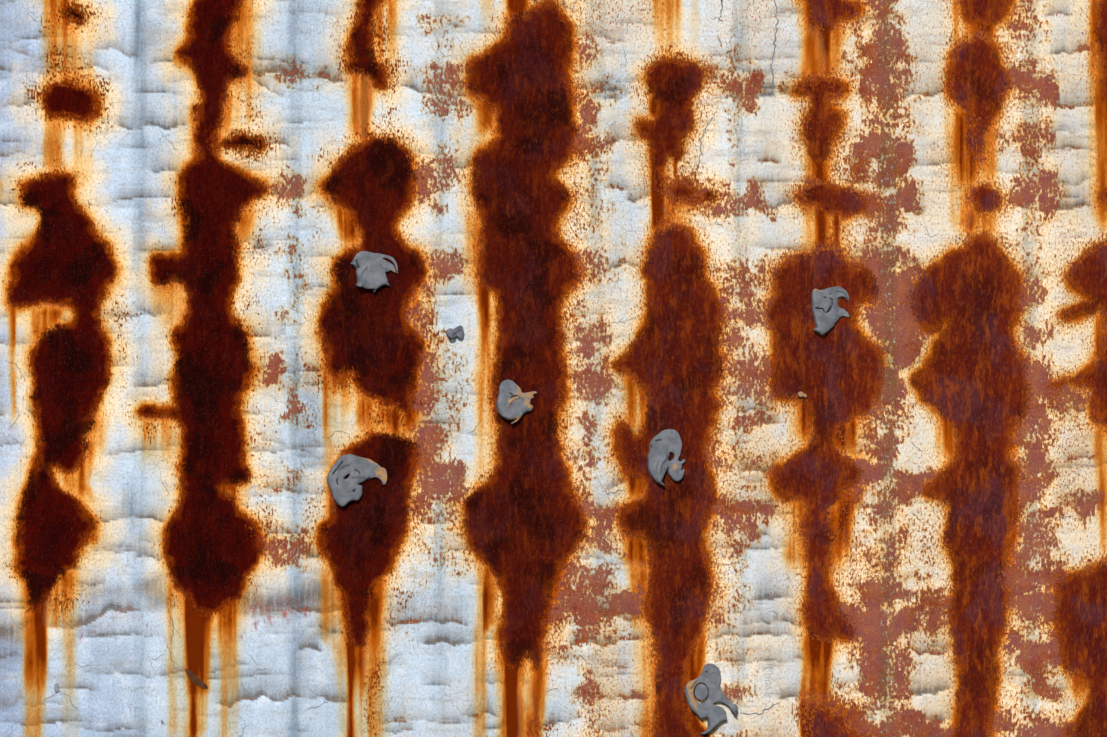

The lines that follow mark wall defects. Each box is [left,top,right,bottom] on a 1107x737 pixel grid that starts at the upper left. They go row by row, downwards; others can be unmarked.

corrosion [416,7,470,50]
corrosion [260,57,313,88]
corrosion [1080,0,1107,221]
corrosion [3,141,145,691]
corrosion [565,665,610,737]
corrosion [723,681,758,704]